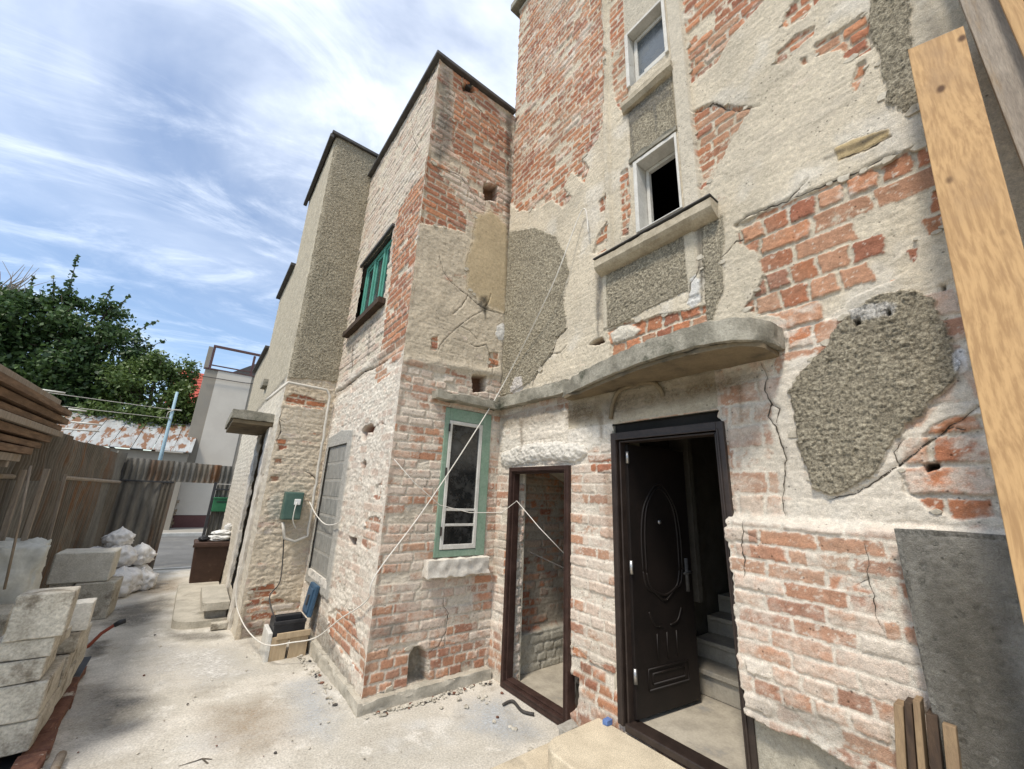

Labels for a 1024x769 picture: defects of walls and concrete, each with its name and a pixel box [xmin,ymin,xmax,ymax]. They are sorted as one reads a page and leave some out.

flaking render [771,0,881,92]
flaking render [451,0,631,212]
flaking render [690,102,752,190]
flaking render [373,156,467,387]
crack [440,266,500,362]
flaking render [588,305,707,357]
flaking render [734,141,944,346]
spalling [938,281,950,294]
crack [761,365,787,515]
crack [830,411,972,500]
crack [858,543,885,632]